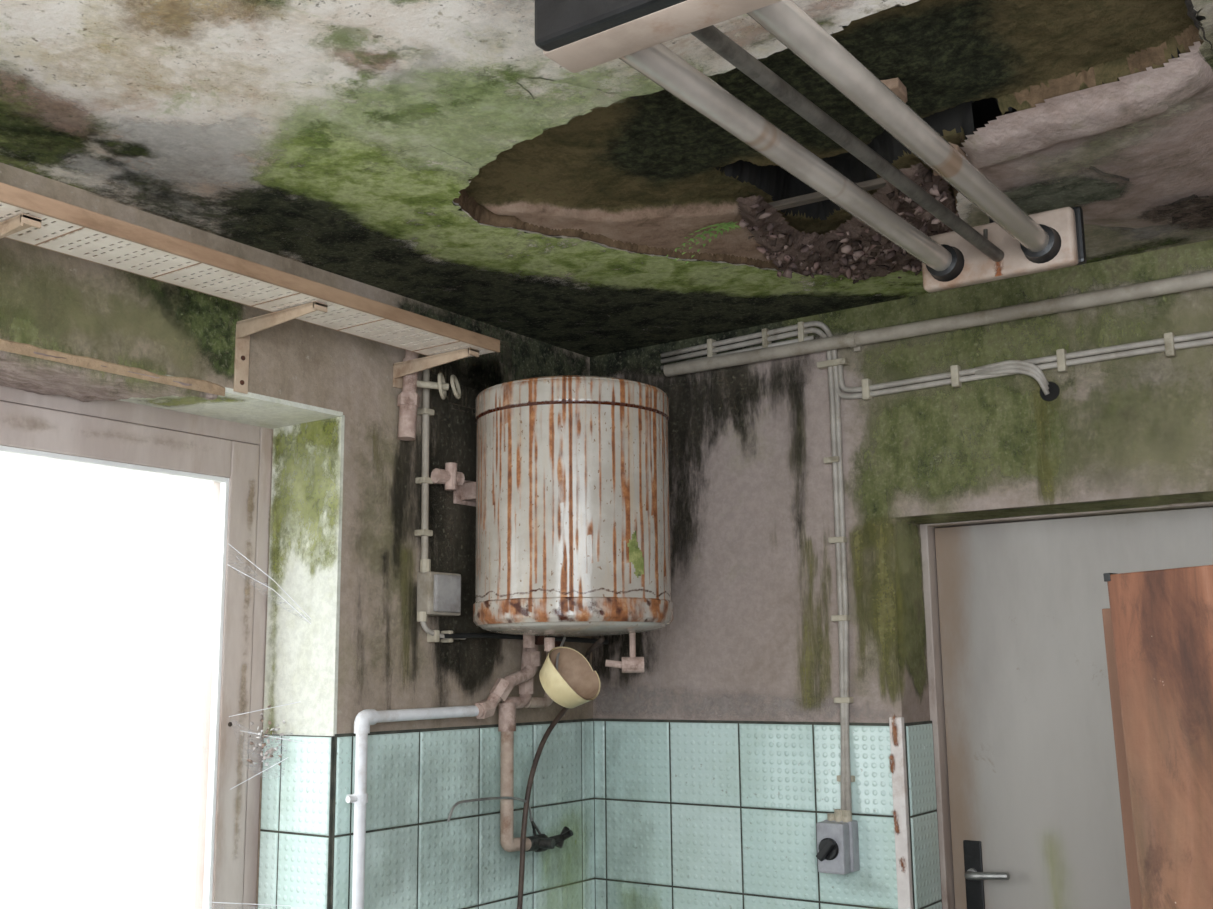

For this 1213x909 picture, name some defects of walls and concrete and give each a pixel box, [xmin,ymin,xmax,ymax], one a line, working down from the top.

peeling [0,71,89,132]
peeling [335,49,394,70]
spalling [707,48,959,236]
spalling [830,0,1204,161]
leakage [1191,0,1213,68]
spalling [453,89,922,284]
leakage [965,204,989,227]
leakage [1084,221,1213,260]
leakage [0,139,908,708]
leakage [870,362,982,447]
leakage [1001,294,1213,501]